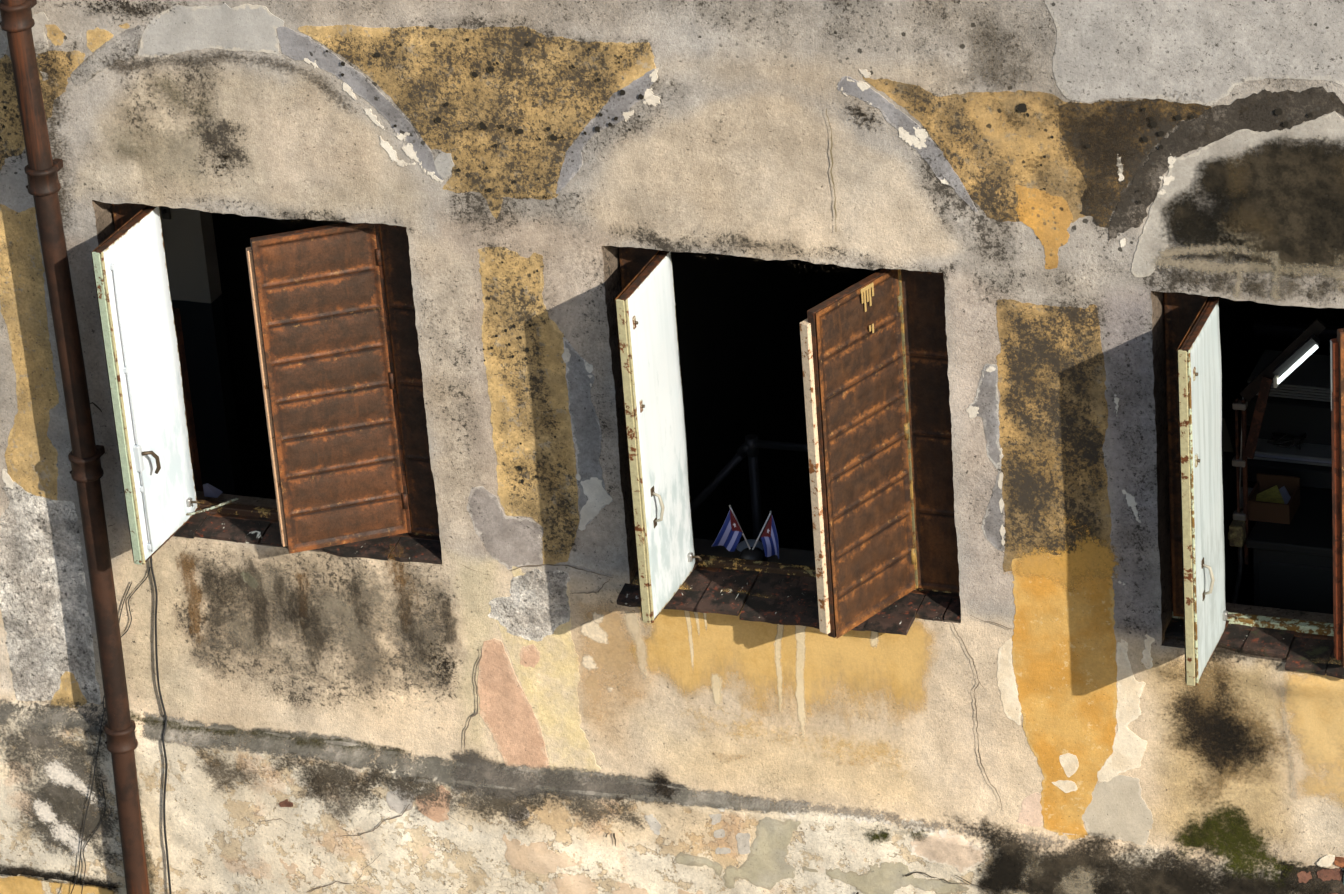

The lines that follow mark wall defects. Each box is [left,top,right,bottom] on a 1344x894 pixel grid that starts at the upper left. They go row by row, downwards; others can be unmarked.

peeling [298,24,661,219]
peeling [836,69,1212,269]
water stain [1163,137,1344,301]
flaking render [0,204,101,709]
water stain [190,560,467,692]
peeling [467,247,613,773]
water stain [131,712,1331,894]
water stain [581,602,932,732]
peeling [674,806,985,894]
crack [952,615,1011,810]
peeling [966,299,1155,840]
water stain [1169,645,1344,802]